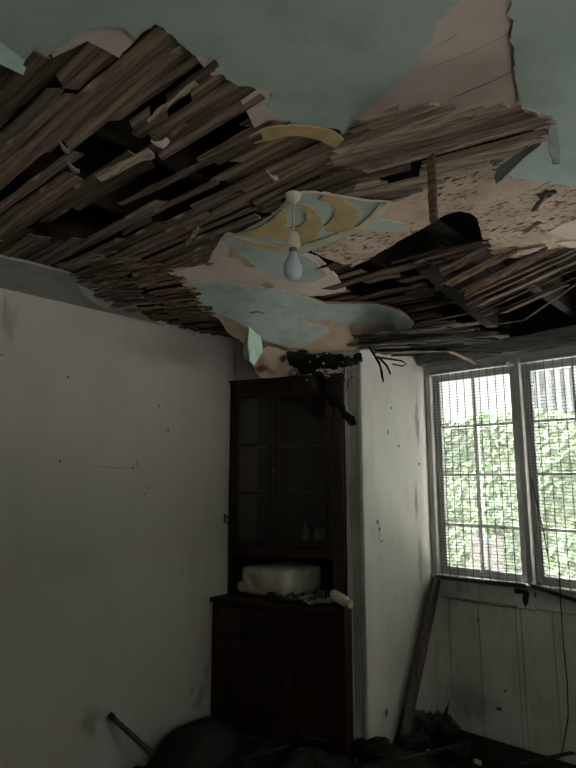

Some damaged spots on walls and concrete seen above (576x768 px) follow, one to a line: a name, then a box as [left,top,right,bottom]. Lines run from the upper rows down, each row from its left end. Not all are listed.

peeling [0,42,26,75]
peeling [52,26,136,58]
peeling [196,55,222,76]
peeling [358,0,540,130]
peeling [241,90,279,128]
flaking render [56,123,576,366]